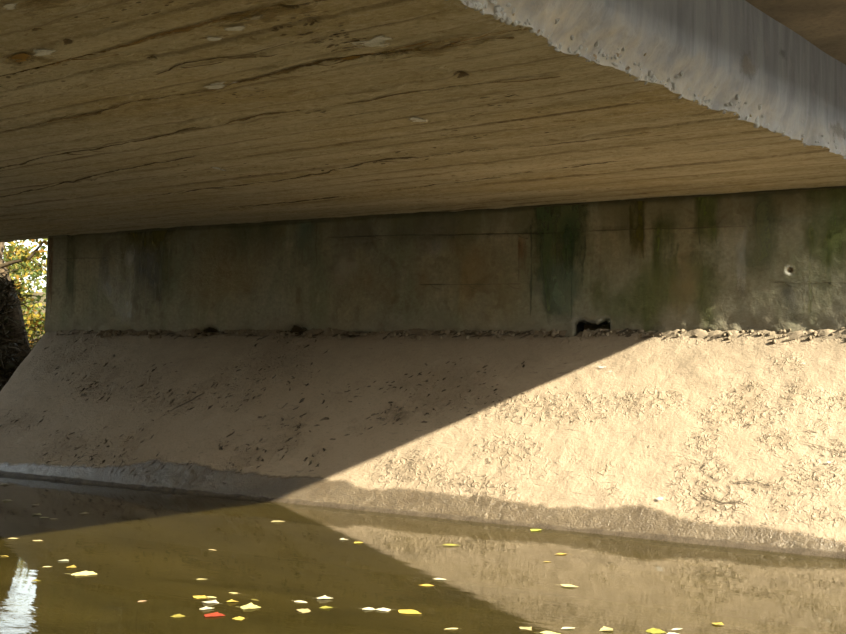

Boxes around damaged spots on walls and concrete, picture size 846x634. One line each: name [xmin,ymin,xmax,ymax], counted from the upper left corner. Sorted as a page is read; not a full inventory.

spalling [464,0,846,158]
spalling [46,321,846,352]